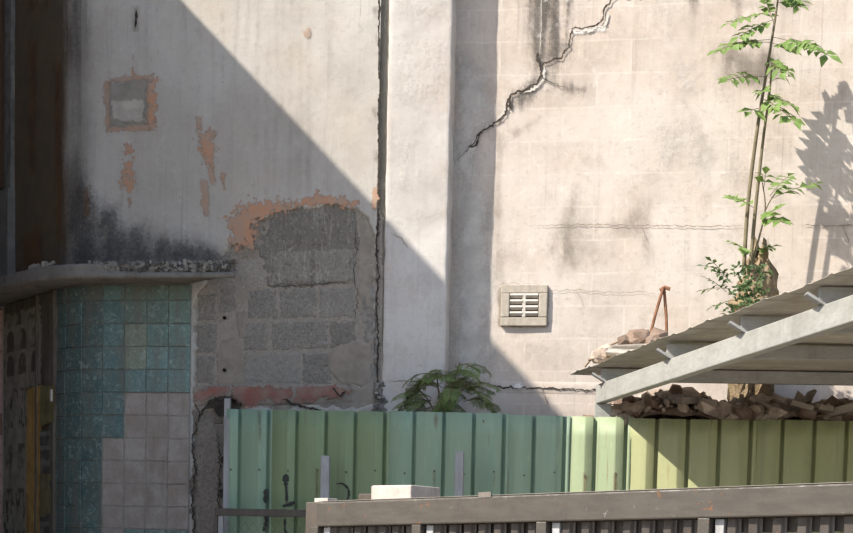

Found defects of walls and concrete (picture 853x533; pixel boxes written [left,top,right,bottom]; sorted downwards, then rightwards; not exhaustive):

water stain [535,0,559,56]
peeling [102,57,161,132]
water stain [512,81,535,107]
crack [458,0,611,166]
water stain [15,0,84,273]
peeling [118,143,136,205]
peeling [195,117,226,190]
water stain [76,214,218,264]
flaking render [88,179,388,508]